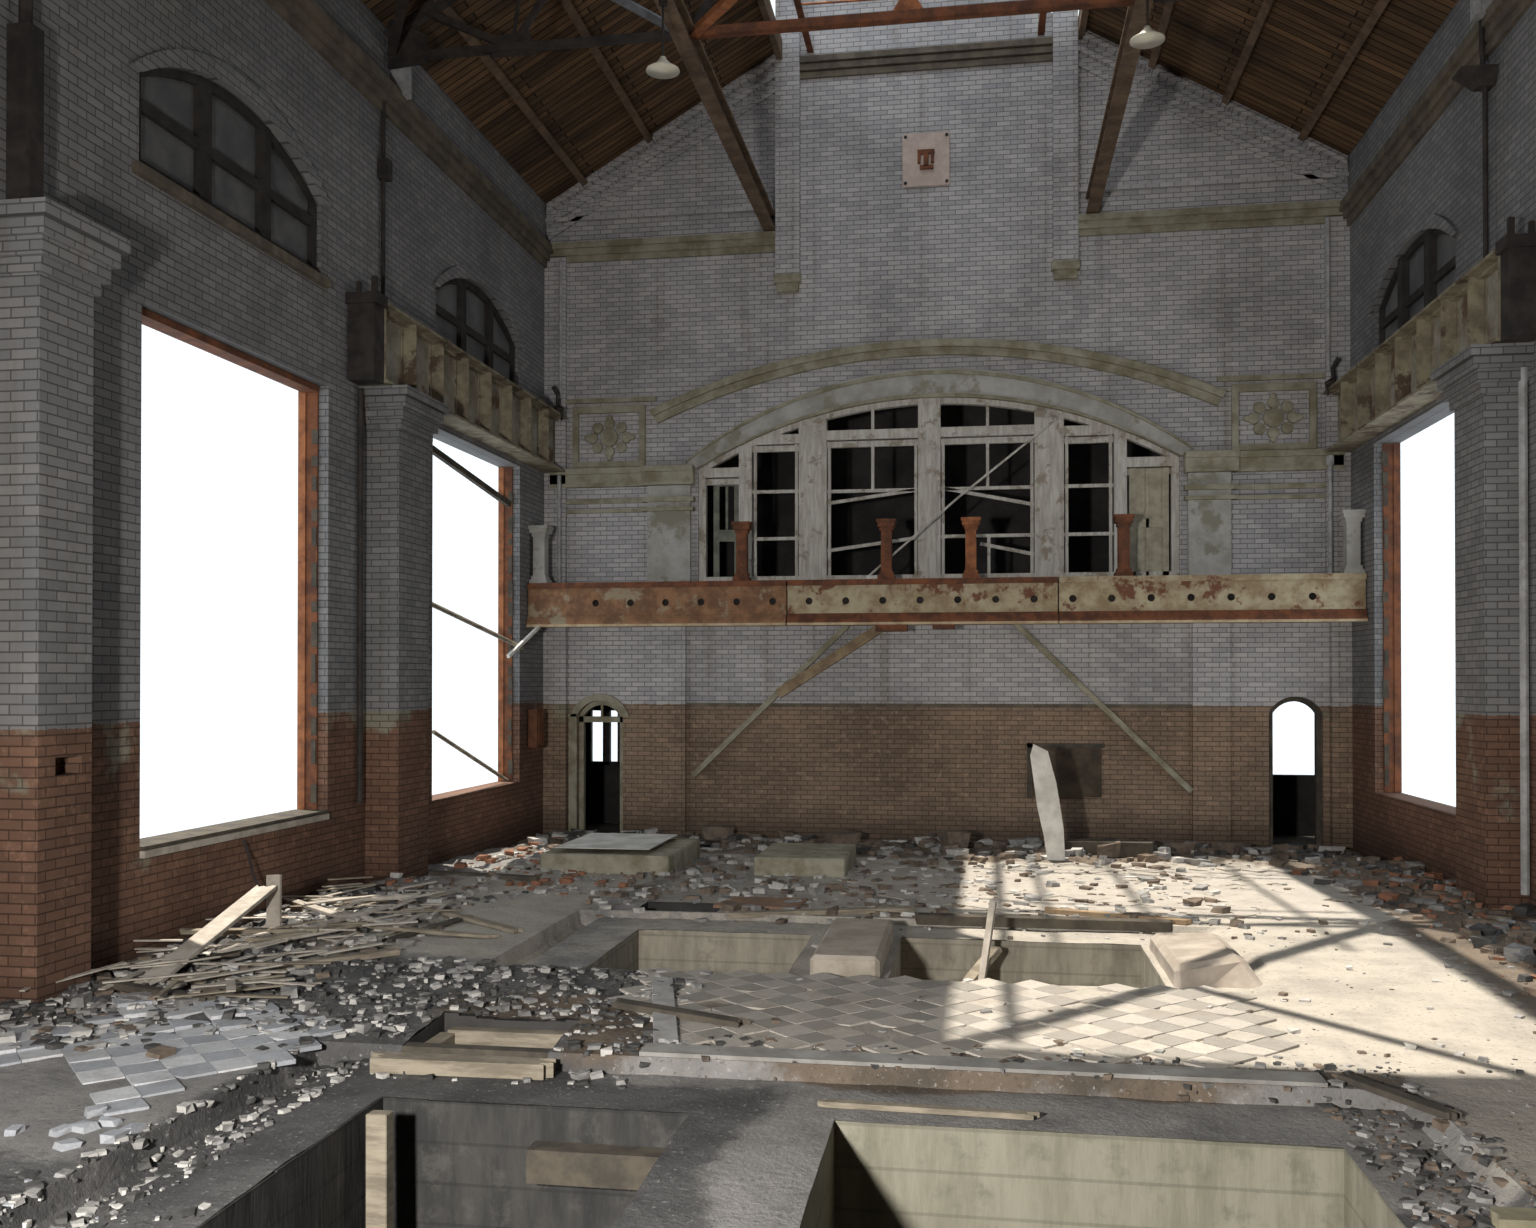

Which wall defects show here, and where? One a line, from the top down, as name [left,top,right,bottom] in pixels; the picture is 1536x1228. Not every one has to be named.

spalling [4,1124,26,1137]
spalling [48,1103,147,1152]